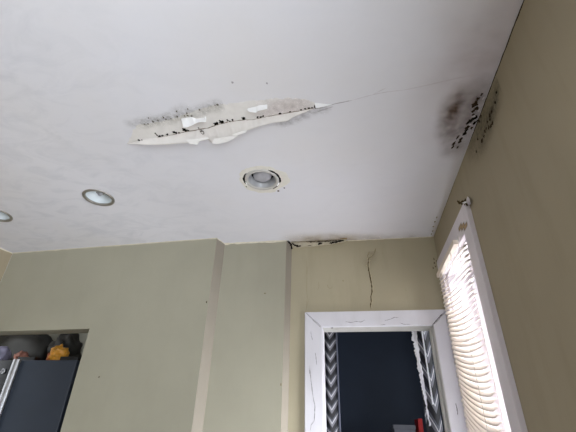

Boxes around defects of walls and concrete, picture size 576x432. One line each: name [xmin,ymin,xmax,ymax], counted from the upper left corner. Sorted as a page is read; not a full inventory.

crack [316,0,524,143]
peeling [127,97,332,145]
damp [446,100,463,120]
damp [451,93,496,149]
crack [367,249,376,307]